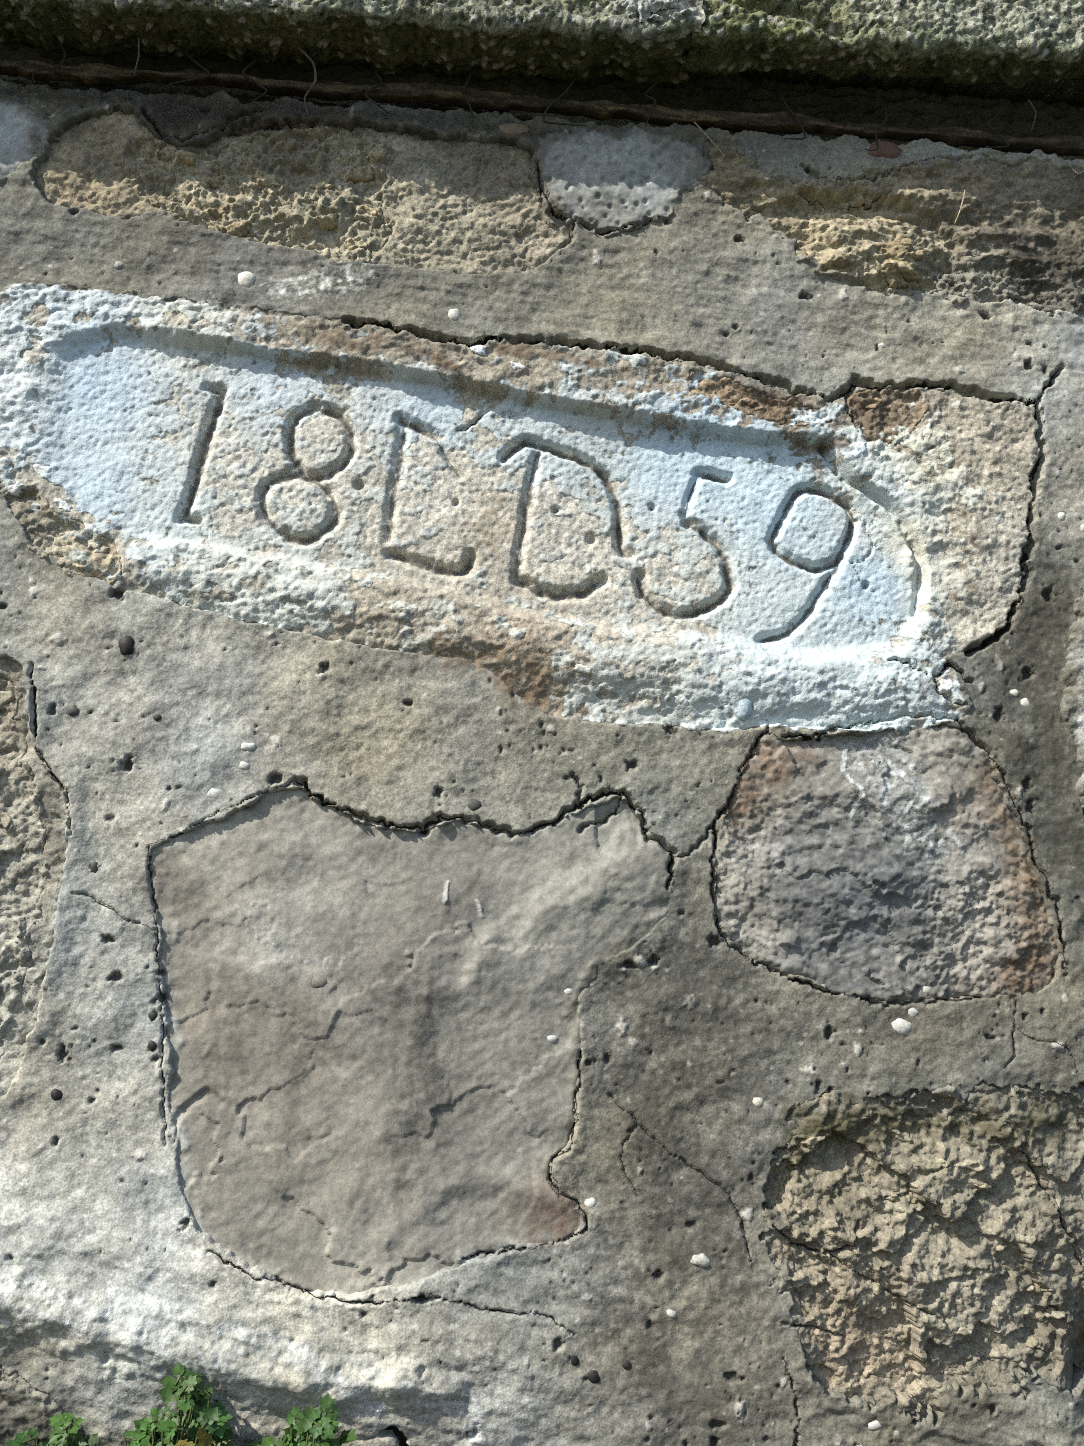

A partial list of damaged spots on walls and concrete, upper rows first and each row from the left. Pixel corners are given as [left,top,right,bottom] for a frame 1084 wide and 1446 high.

crack [349,321,680,362]
peeling [0,283,1021,733]
crack [78,370,1067,1144]
crack [1006,1006,1078,1079]
spalling [777,1109,1084,1383]
crack [782,1323,843,1446]